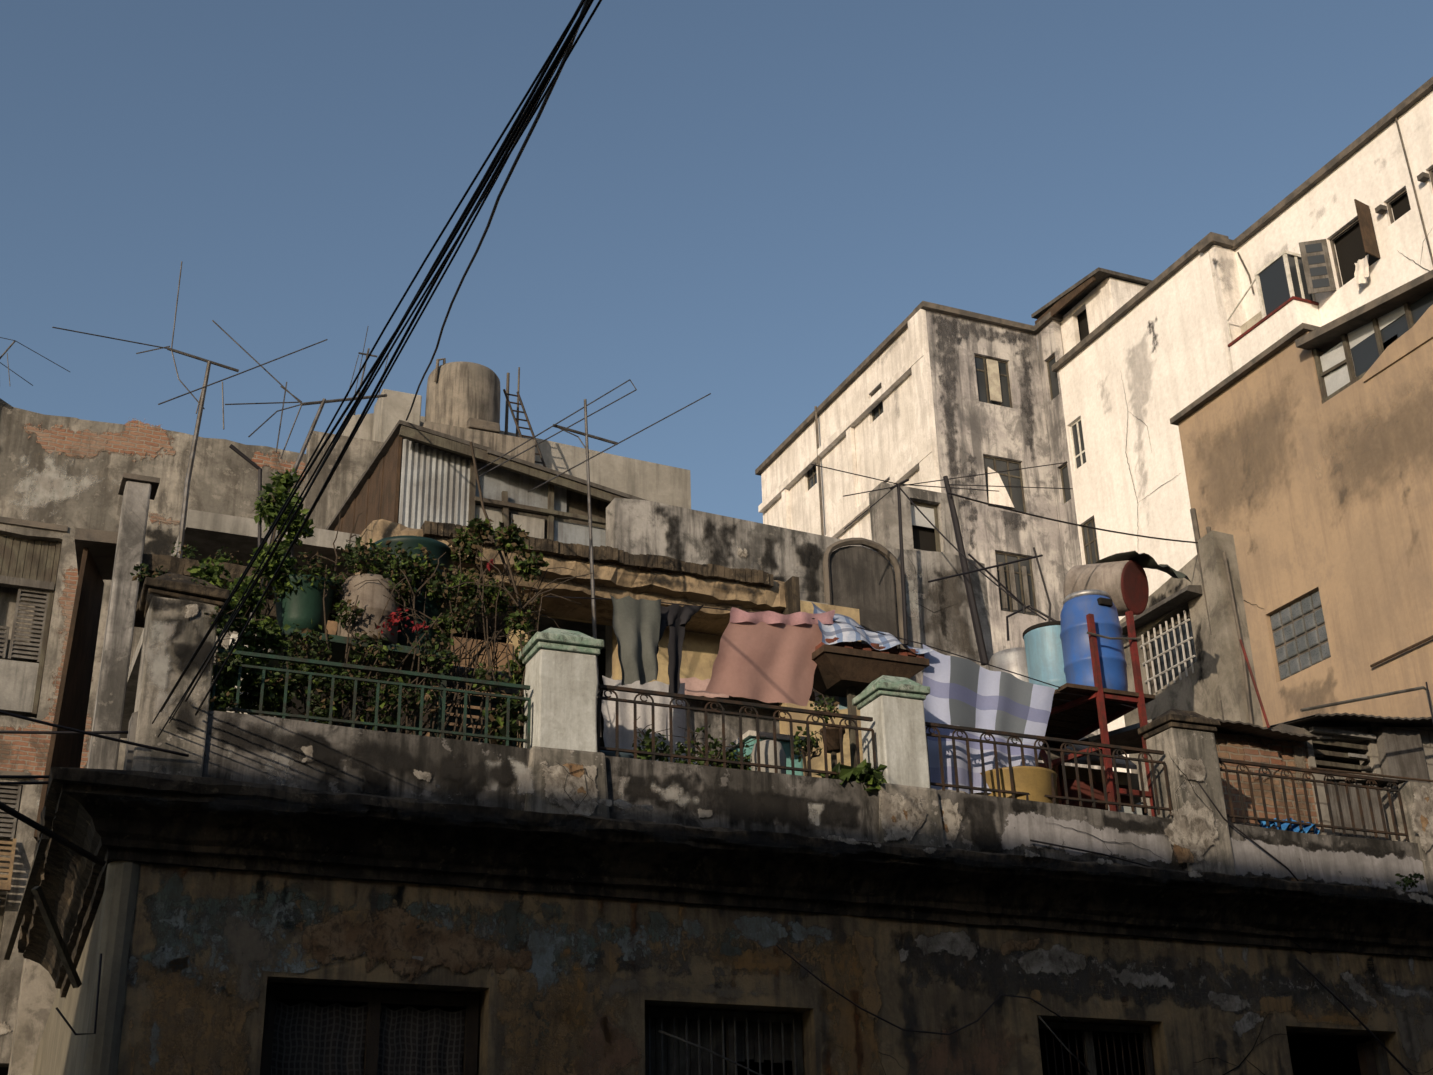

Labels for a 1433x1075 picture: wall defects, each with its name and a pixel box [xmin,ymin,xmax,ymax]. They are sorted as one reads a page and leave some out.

flaking render [24,419,175,462]
damp [933,315,1034,548]
damp [618,507,685,585]
damp [703,520,784,582]
damp [796,542,822,602]
damp [202,719,595,832]
peeling [513,760,654,816]
damp [619,774,866,857]
peeling [1164,800,1218,878]
peeling [899,929,977,963]
peeling [1000,937,1086,1002]
peeling [1107,968,1177,1006]